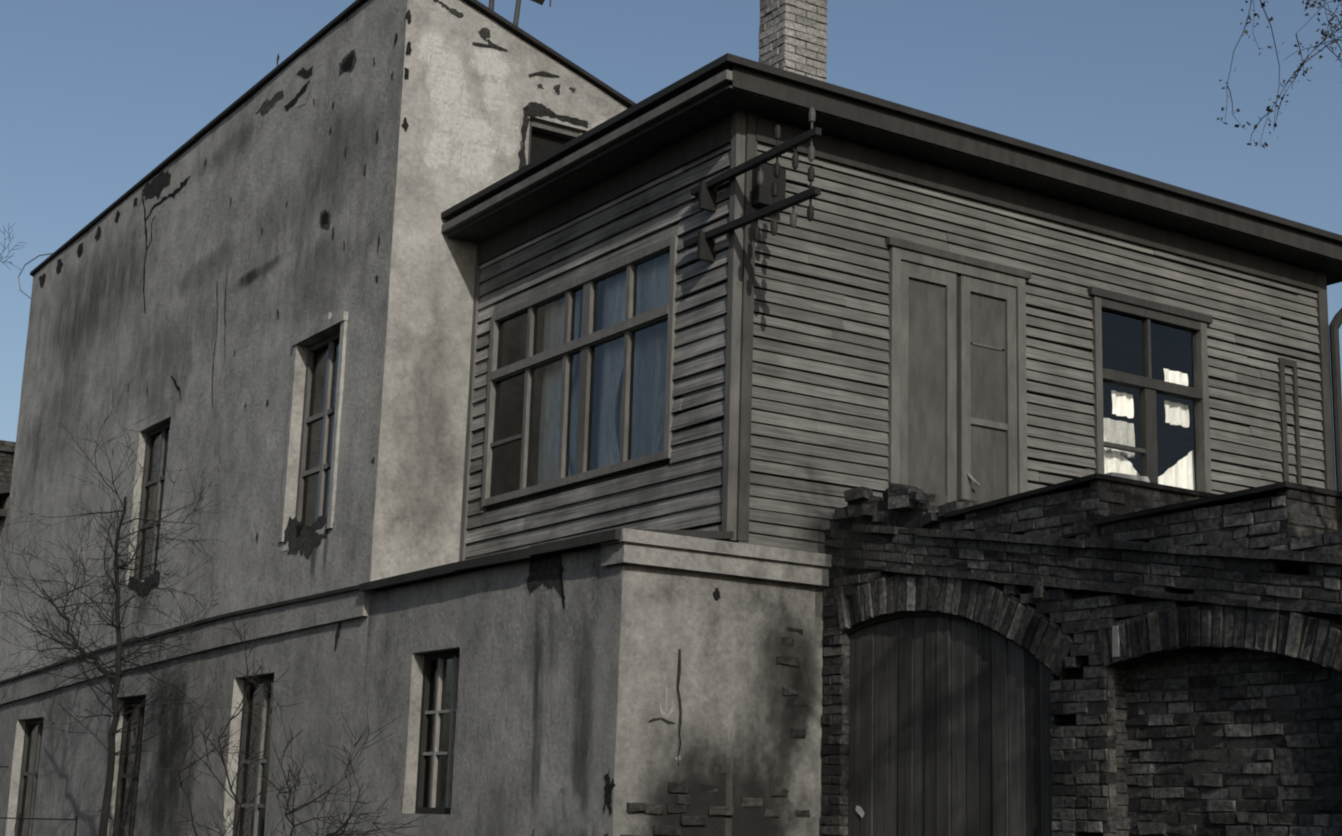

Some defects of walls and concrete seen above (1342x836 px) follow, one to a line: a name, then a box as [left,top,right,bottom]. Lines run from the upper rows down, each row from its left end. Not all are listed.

spalling [433,0,464,18]
peeling [255,66,315,115]
spalling [339,50,357,75]
peeling [391,10,605,185]
spalling [115,169,188,223]
crack [142,176,190,313]
spalling [282,516,334,559]
peeling [527,552,565,608]
crack [648,649,682,766]
water stain [766,631,811,747]
spalling [554,764,810,836]
water stain [655,750,776,836]